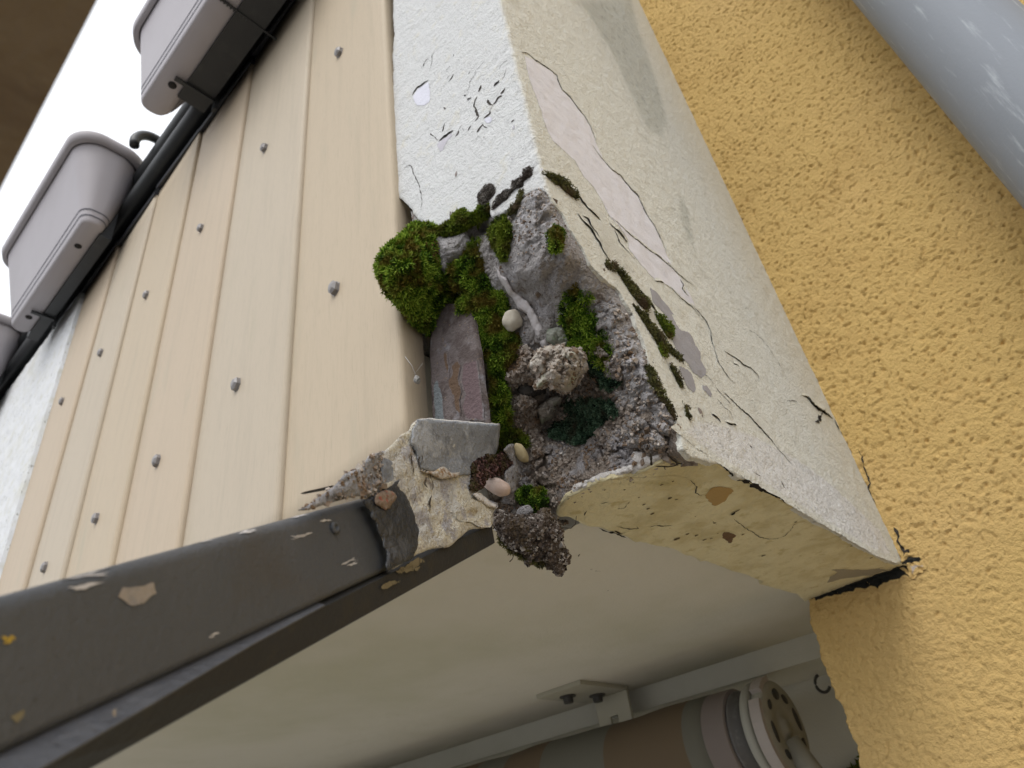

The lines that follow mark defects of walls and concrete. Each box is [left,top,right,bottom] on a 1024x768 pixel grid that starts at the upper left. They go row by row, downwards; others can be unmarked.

crack [423,51,791,495]
efflorescence [494,266,547,348]
spalling [446,57,712,526]
spalling [422,330,431,358]
water stain [598,476,690,491]
crack [859,452,875,502]
peeling [374,490,397,510]
crack [894,528,909,556]
peeling [381,557,424,589]
peeling [118,582,157,606]